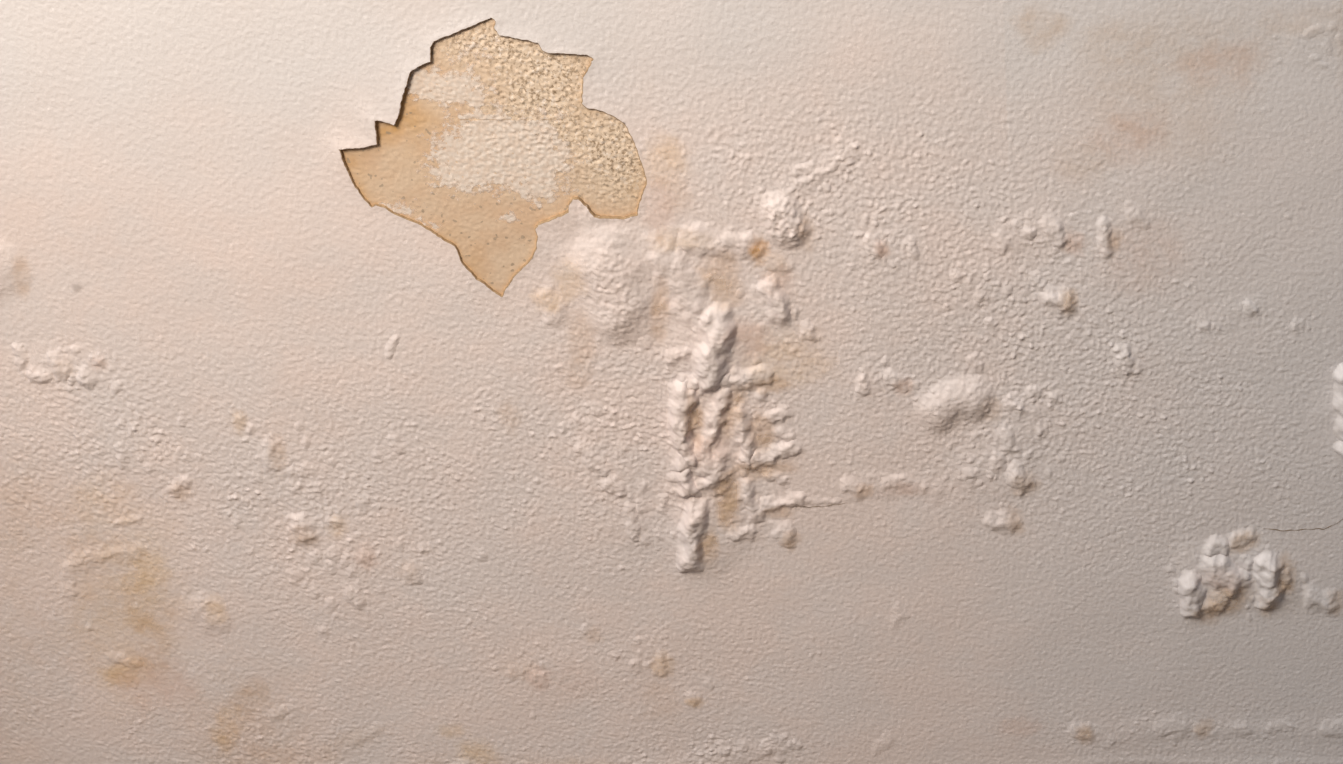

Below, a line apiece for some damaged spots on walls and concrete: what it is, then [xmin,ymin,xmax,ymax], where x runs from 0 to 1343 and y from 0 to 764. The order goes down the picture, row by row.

peeling [339,18,647,297]